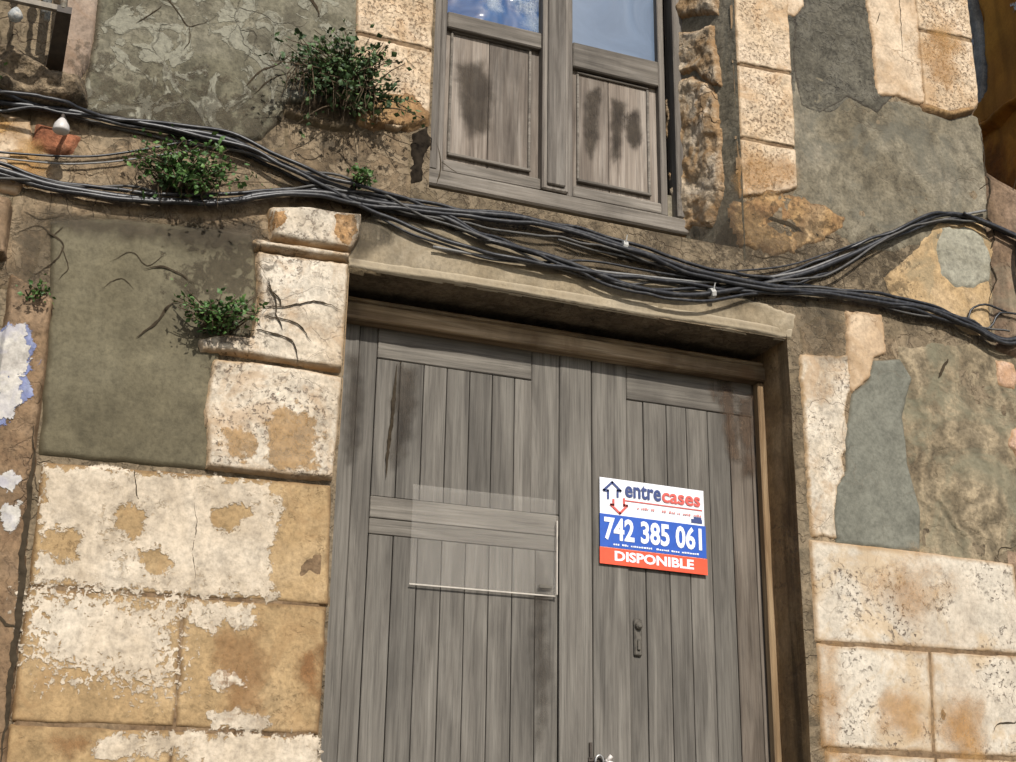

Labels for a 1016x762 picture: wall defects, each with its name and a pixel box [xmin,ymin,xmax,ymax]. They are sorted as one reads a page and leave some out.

spalling [793,0,892,113]
water stain [461,64,490,131]
water stain [585,88,600,155]
water stain [612,100,641,157]
crack [106,252,165,288]
peeling [0,321,41,426]
peeling [218,399,326,471]
peeling [834,359,920,552]
peeling [0,470,23,534]
peeling [8,462,287,716]
peeling [91,706,324,762]